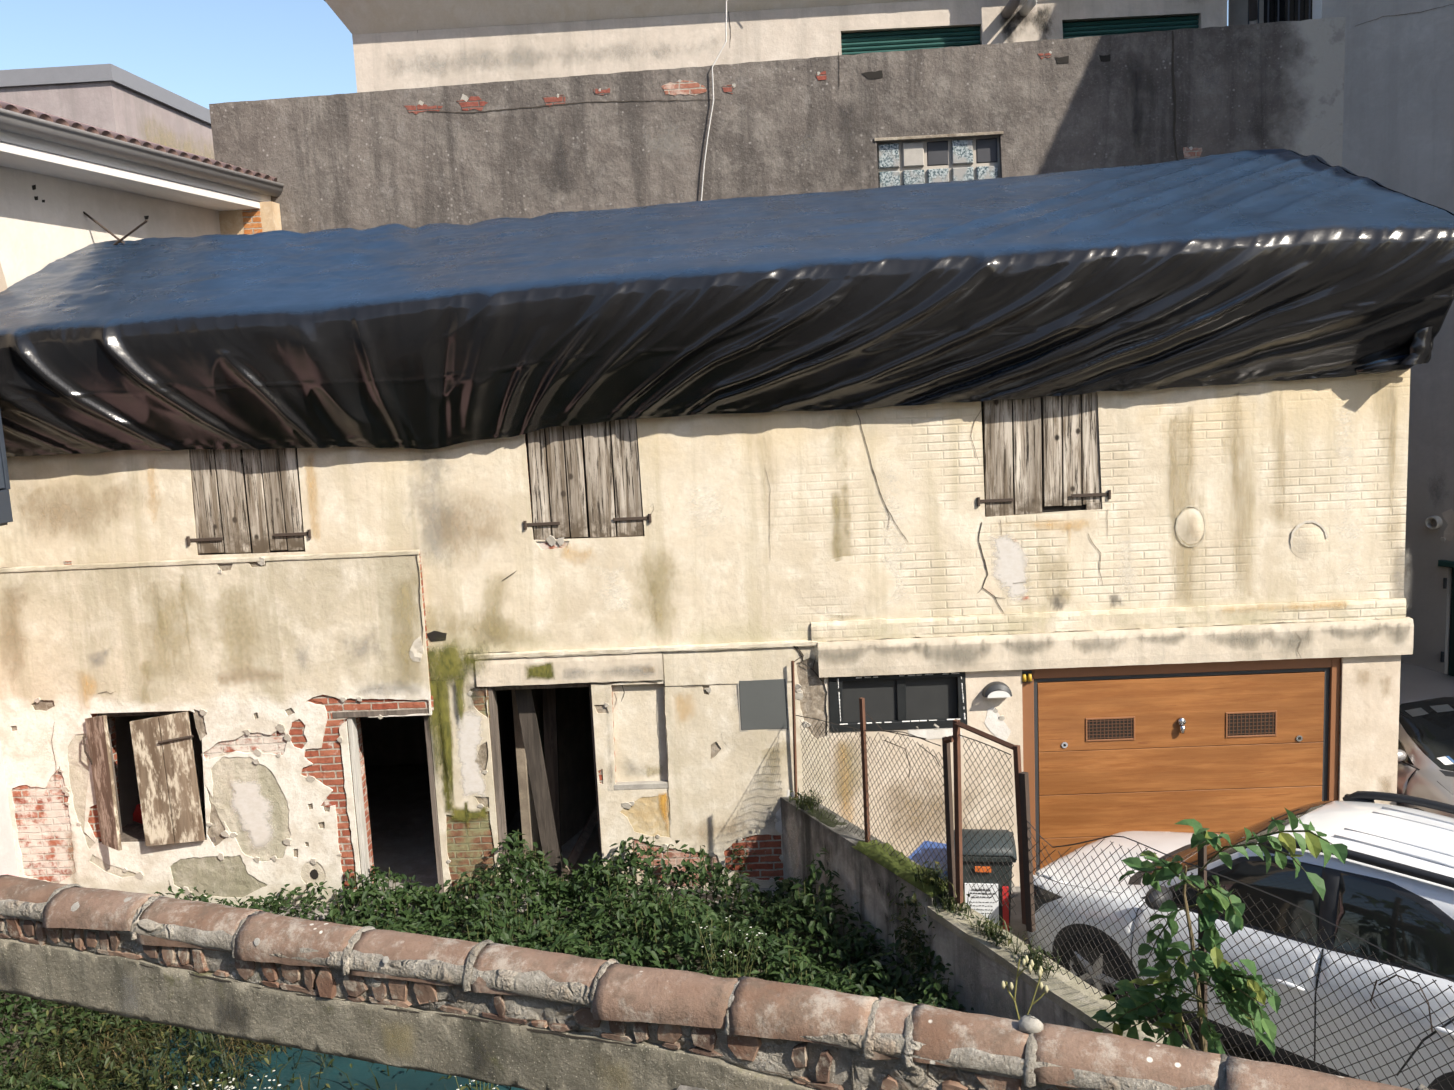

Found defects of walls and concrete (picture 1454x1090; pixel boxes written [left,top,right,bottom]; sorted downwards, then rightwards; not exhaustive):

crack [978,521,1030,613]
peeling [994,536,1028,599]
damp [926,648,987,662]
flaking render [12,734,144,883]
peeling [170,695,434,899]
flaking render [620,790,801,890]